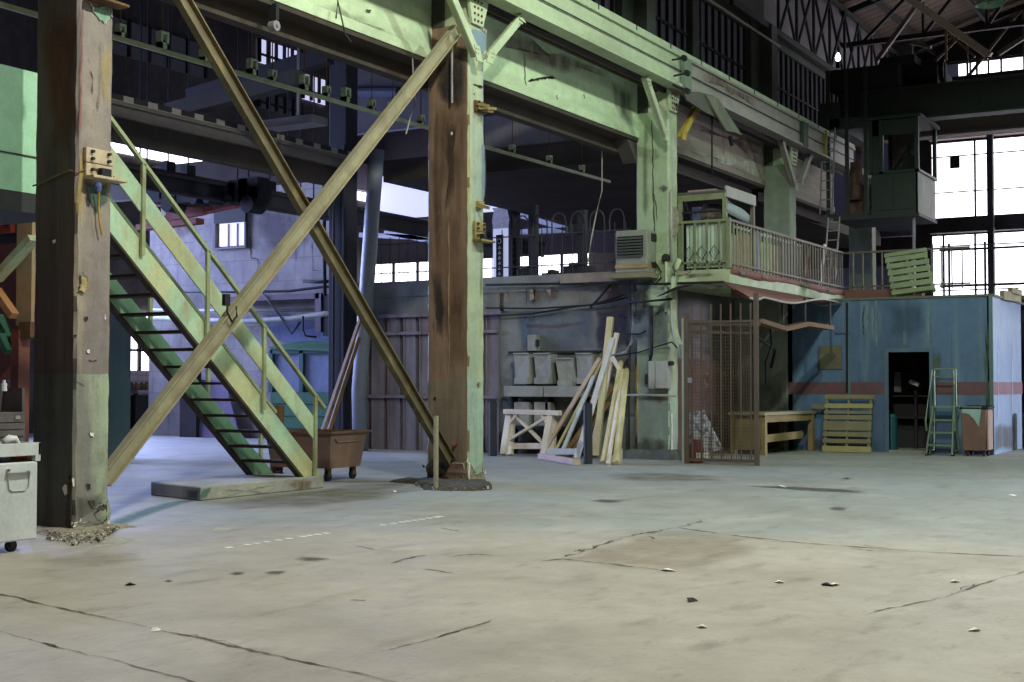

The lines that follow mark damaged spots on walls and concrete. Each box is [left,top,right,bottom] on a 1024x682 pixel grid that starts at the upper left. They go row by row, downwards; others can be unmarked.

spalling [62,476,110,528]
crack [540,521,817,567]
crack [0,594,102,617]
crack [121,661,195,682]
crack [173,632,362,674]